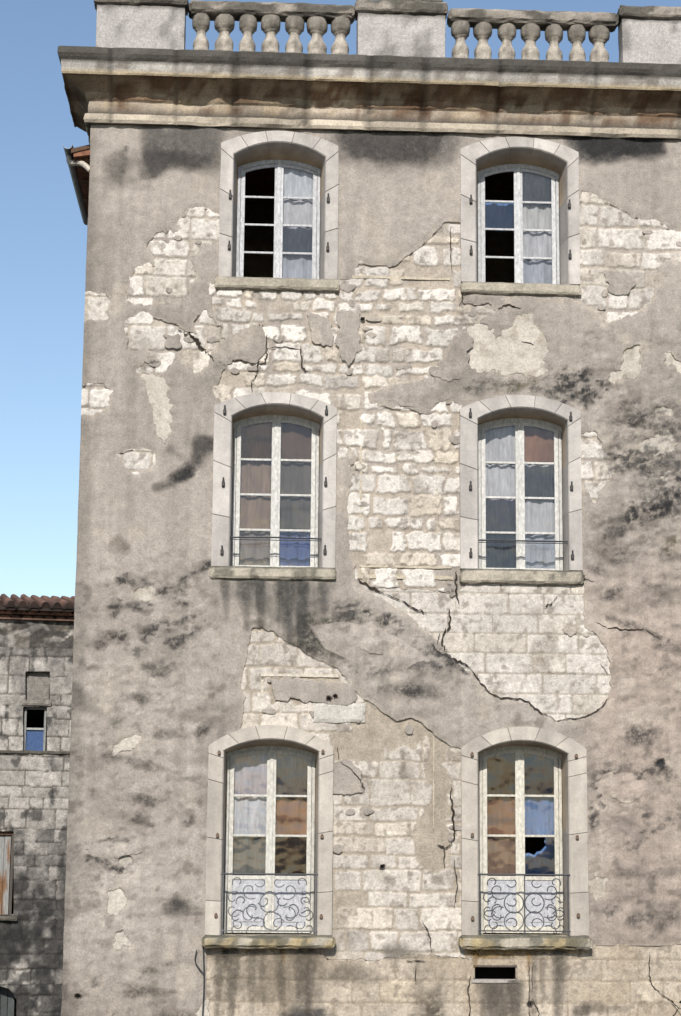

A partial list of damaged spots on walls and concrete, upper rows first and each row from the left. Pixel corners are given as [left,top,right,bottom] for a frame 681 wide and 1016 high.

damp [144,126,219,177]
spalling [573,192,681,324]
spalling [84,291,111,323]
spalling [81,383,113,415]
damp [162,436,214,487]
spalling [124,207,616,721]
crack [359,571,610,721]
crack [599,623,658,638]
spalling [240,628,475,961]
crack [438,787,458,907]
damp [290,1008,325,1016]
crack [649,957,681,1016]